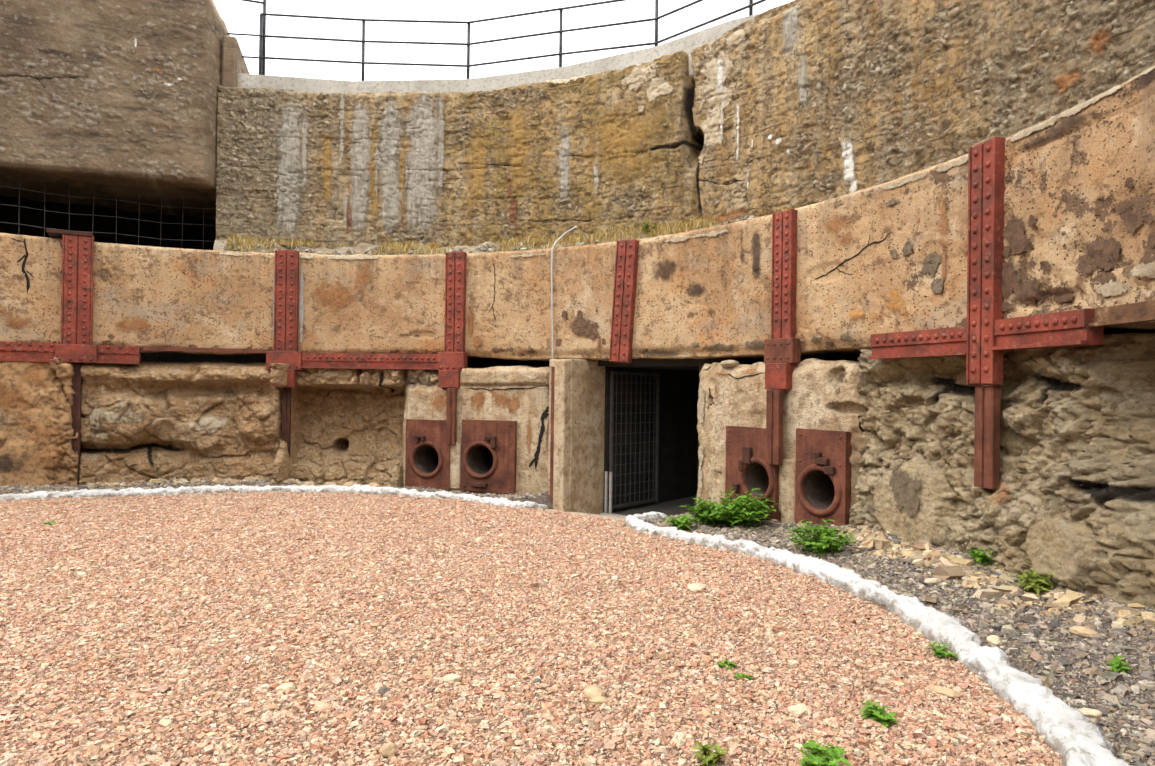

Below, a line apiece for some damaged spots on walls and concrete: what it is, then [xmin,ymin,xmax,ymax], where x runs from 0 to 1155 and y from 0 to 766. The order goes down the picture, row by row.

leakage [276,104,308,237]
leakage [323,92,444,231]
crack [636,82,741,216]
crack [812,231,893,281]